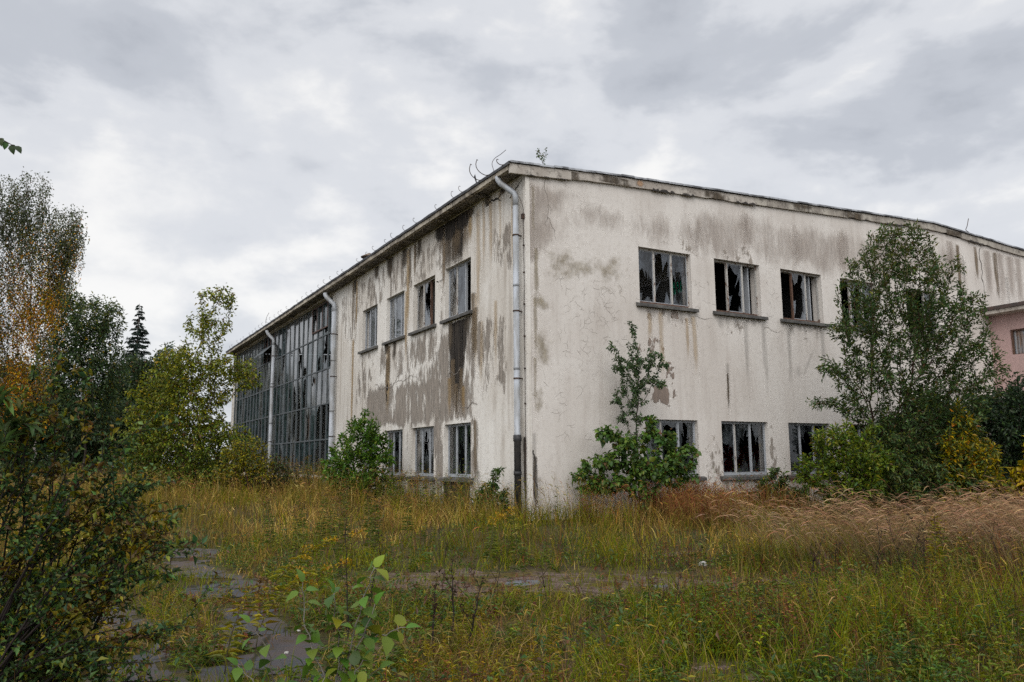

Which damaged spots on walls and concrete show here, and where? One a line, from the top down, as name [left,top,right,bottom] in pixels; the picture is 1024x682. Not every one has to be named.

leakage [375,239,421,278]
leakage [435,188,505,283]
leakage [974,248,1020,290]
leakage [448,293,480,409]
peeling [637,338,676,406]